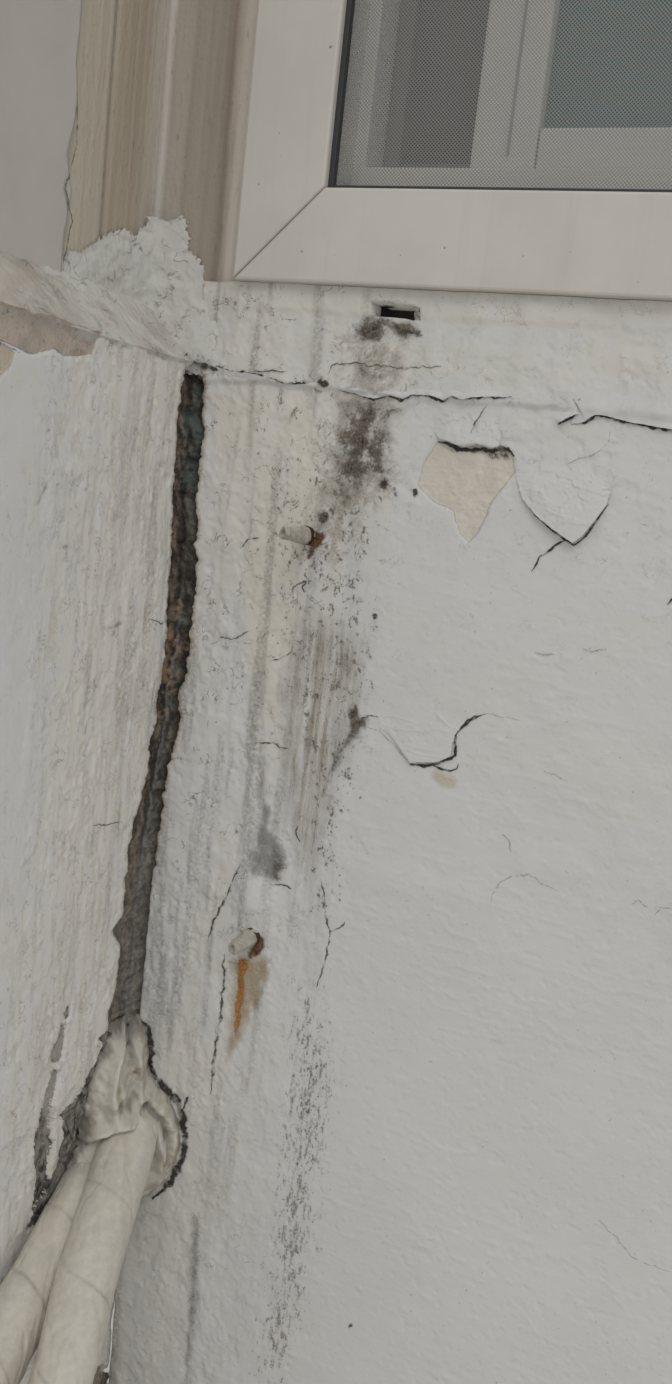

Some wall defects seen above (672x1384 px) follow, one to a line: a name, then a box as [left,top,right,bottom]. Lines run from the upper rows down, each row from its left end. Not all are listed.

spalling [0,301,102,374]
damp [355,317,420,341]
damp [335,403,399,503]
peeling [418,406,515,542]
crack [555,389,672,464]
damp [332,705,365,769]
crack [93,353,516,1200]
rust [210,937,266,1094]
spalling [93,1366,109,1384]